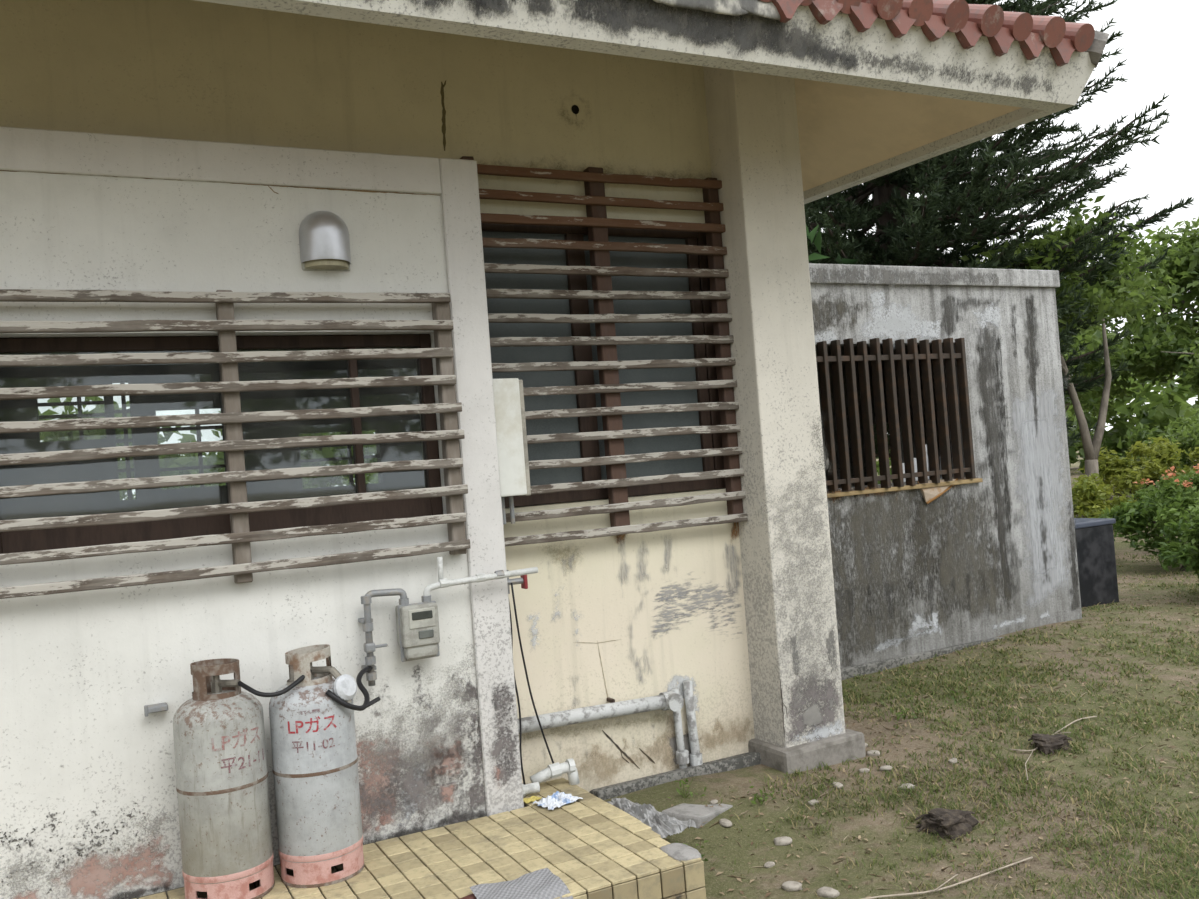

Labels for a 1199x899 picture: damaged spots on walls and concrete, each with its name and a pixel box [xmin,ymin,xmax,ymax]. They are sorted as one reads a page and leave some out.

damp [415,0,1052,95]
crack [439,81,447,151]
damp [768,266,1040,743]
damp [653,546,739,633]
damp [1069,507,1079,610]
damp [359,665,518,832]
damp [0,803,159,898]